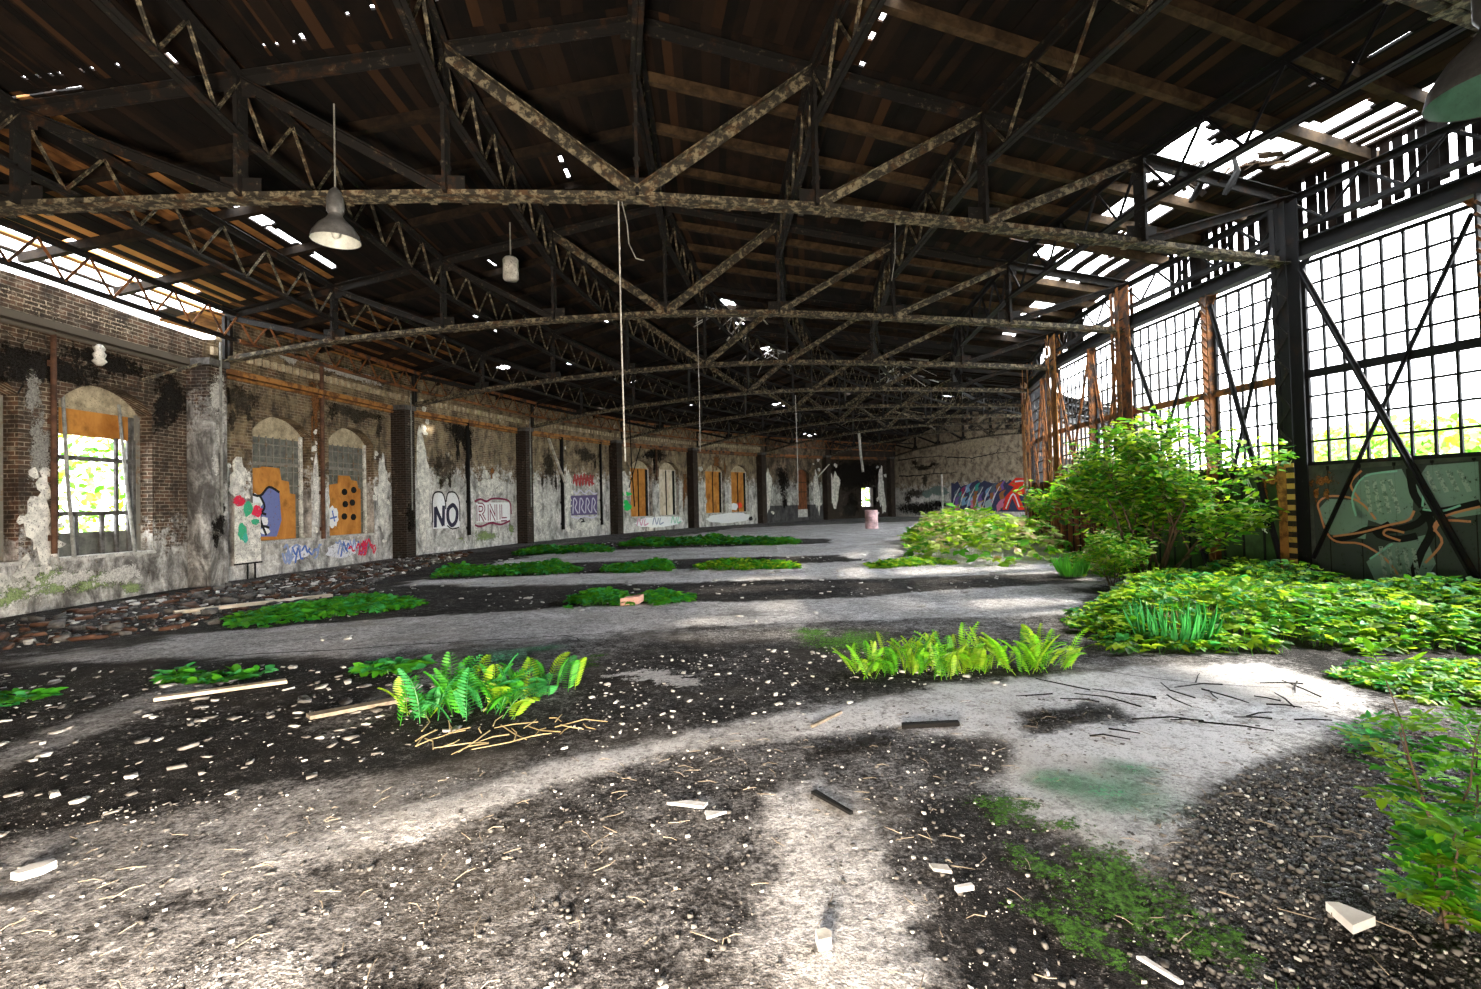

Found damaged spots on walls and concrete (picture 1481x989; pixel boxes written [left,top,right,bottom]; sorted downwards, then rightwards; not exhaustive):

peeling [227,457,251,499]
damp [430,423,474,489]